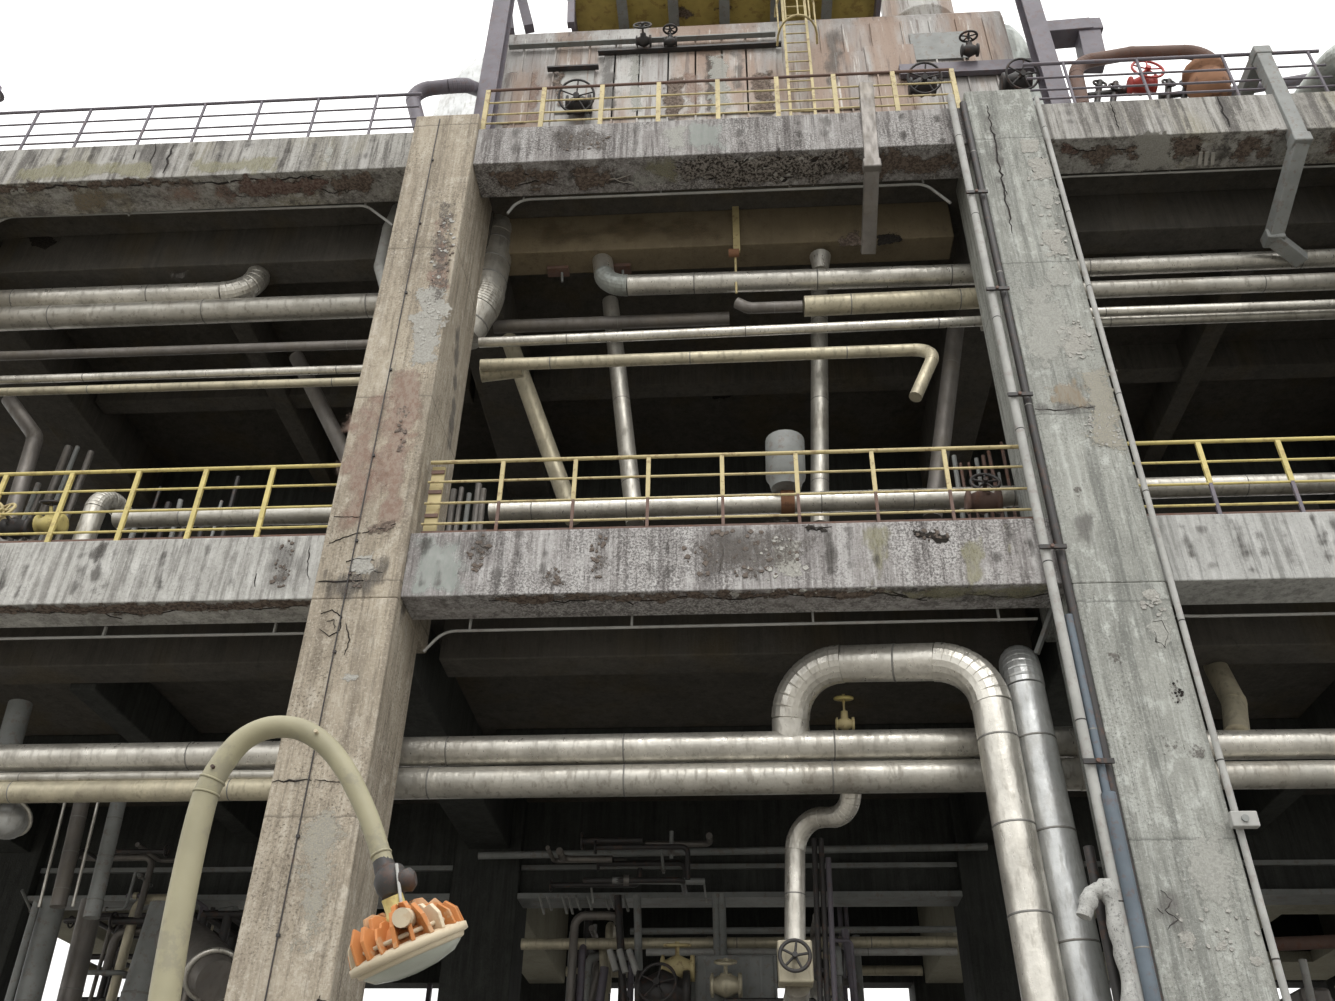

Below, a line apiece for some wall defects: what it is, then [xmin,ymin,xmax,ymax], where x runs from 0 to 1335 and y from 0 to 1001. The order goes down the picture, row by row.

rust [1229,128,1286,162]
crack [987,106,1012,231]
leakage [824,532,836,574]